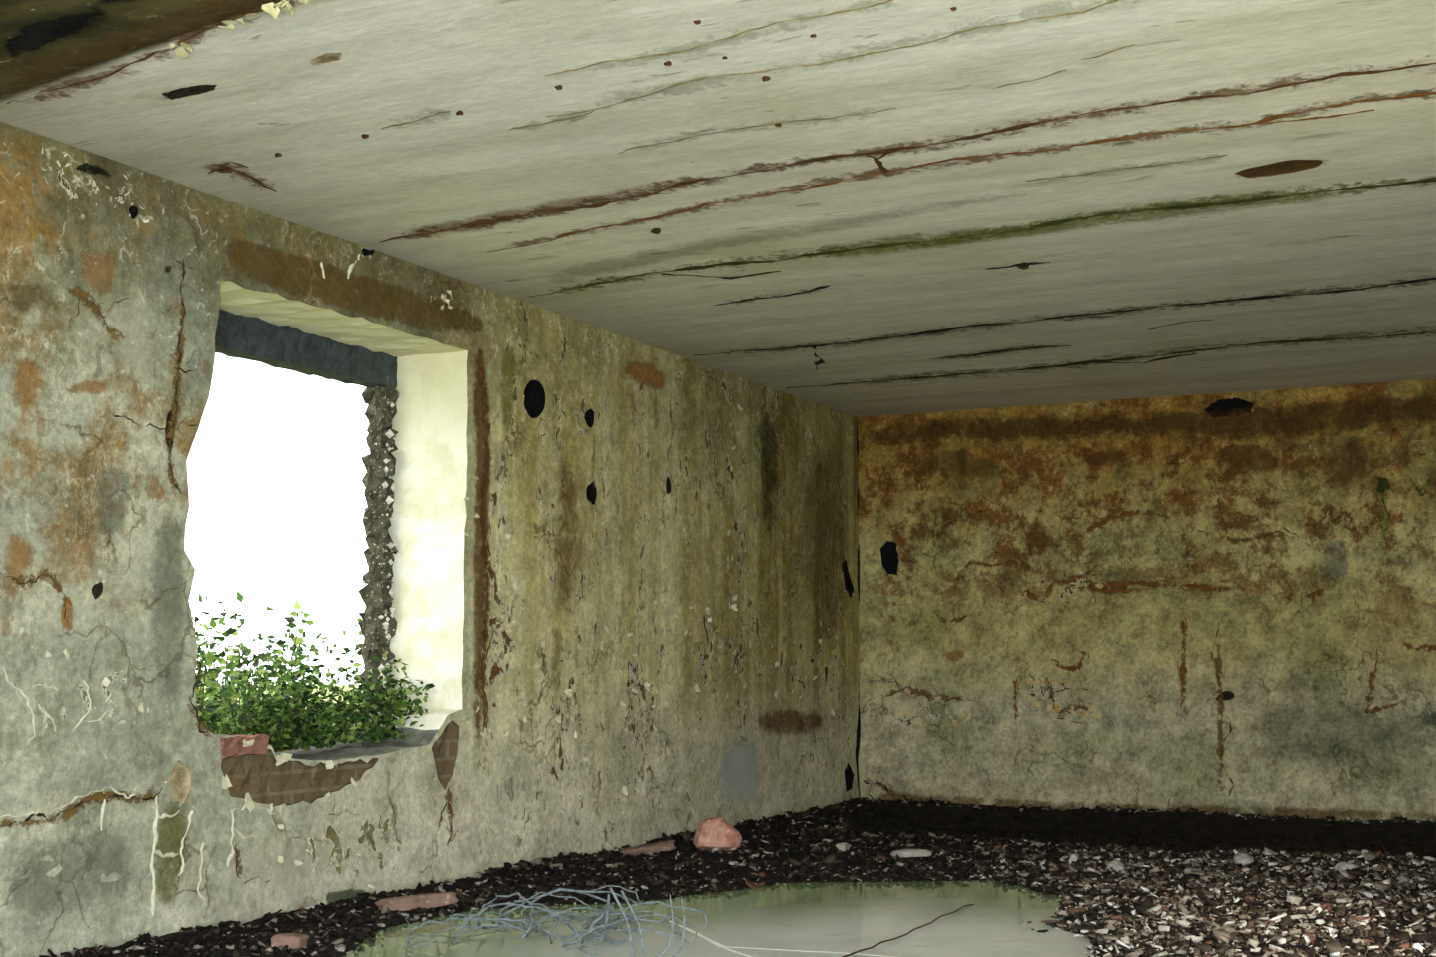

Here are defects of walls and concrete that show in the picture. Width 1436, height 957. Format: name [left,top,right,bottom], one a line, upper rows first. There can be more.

crack [320,55,1436,279]
crack [528,176,1436,306]
corrosion [74,380,106,393]
crack [103,260,197,494]
crack [693,277,1436,388]
corrosion [8,537,32,586]
corrosion [61,598,73,629]
peeling [463,404,843,814]
corrosion [1025,518,1058,555]
crack [0,787,402,915]
flaking render [220,734,415,889]
flaking render [432,720,461,793]